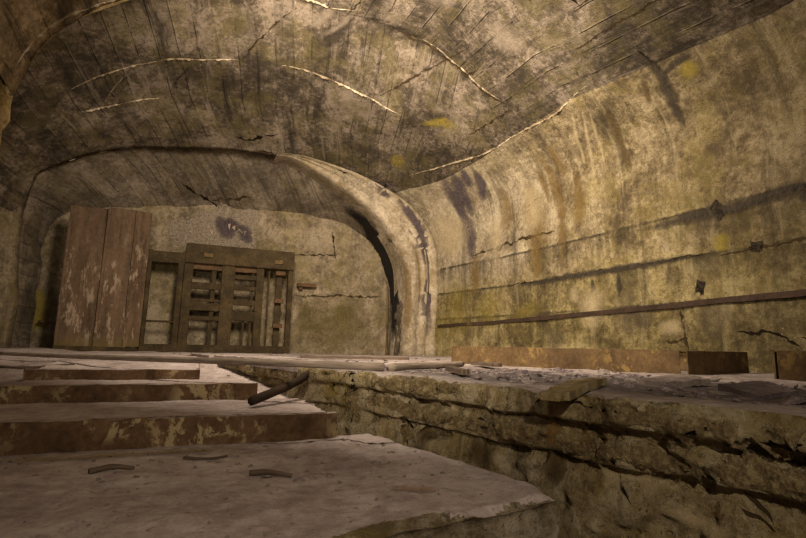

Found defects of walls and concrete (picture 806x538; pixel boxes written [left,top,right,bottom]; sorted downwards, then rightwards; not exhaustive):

crack [575,0,659,50]
crack [380,25,513,135]
leakage [226,219,252,243]
leakage [444,170,486,290]
leakage [505,253,705,294]
crack [737,328,806,347]
crack [261,371,806,531]